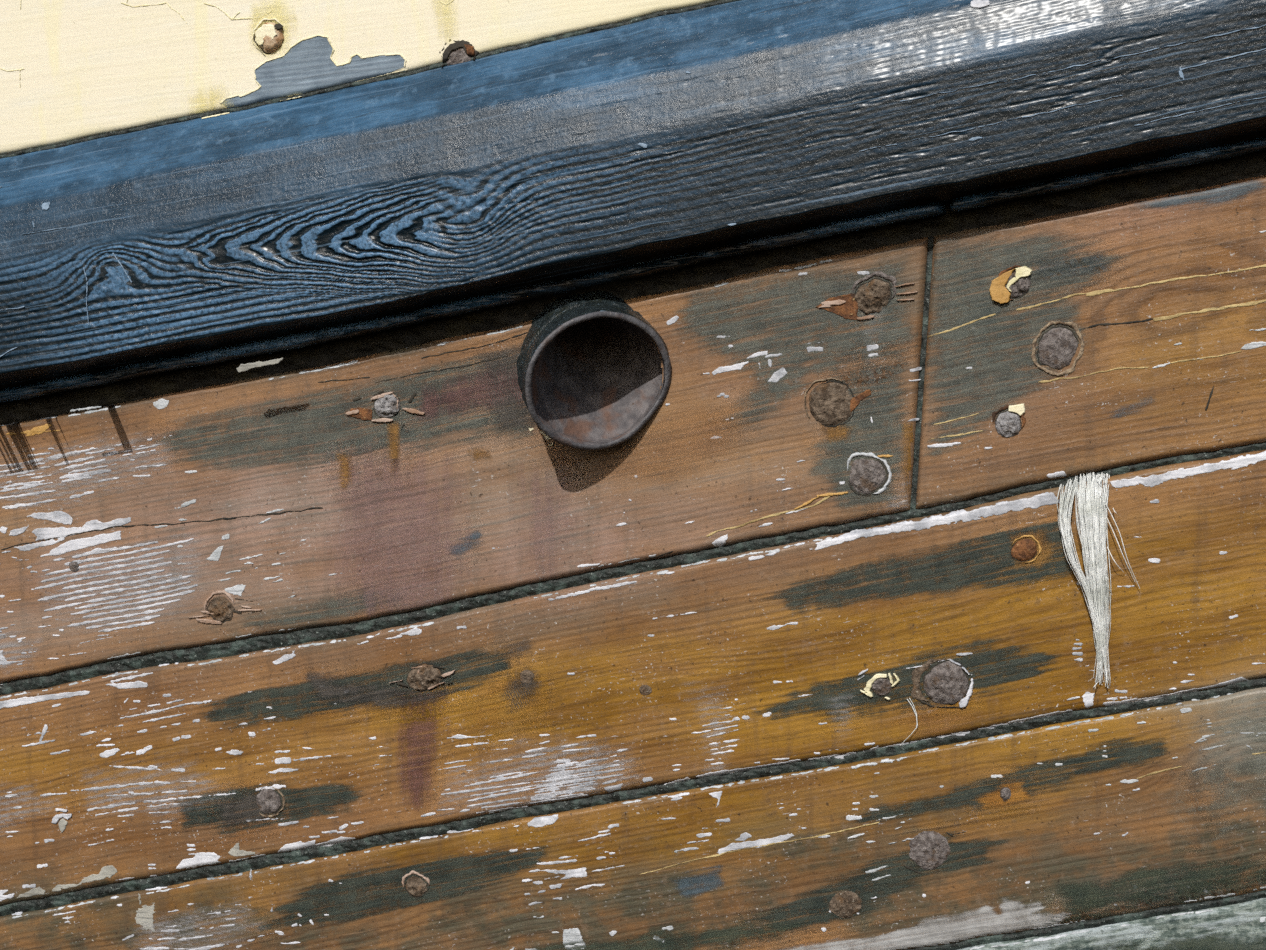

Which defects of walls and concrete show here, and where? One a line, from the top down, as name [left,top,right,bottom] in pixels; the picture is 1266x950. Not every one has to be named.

crack [122,0,273,24]
peeling [201,35,407,119]
peeling [0,404,198,665]
crack [1,507,323,550]
peeling [239,622,434,665]
peeling [0,652,236,846]
peeling [364,674,1248,854]
peeling [0,865,133,918]
peeling [122,864,329,950]
peeling [176,816,364,880]
peeling [509,824,625,918]
peeling [791,901,1130,950]